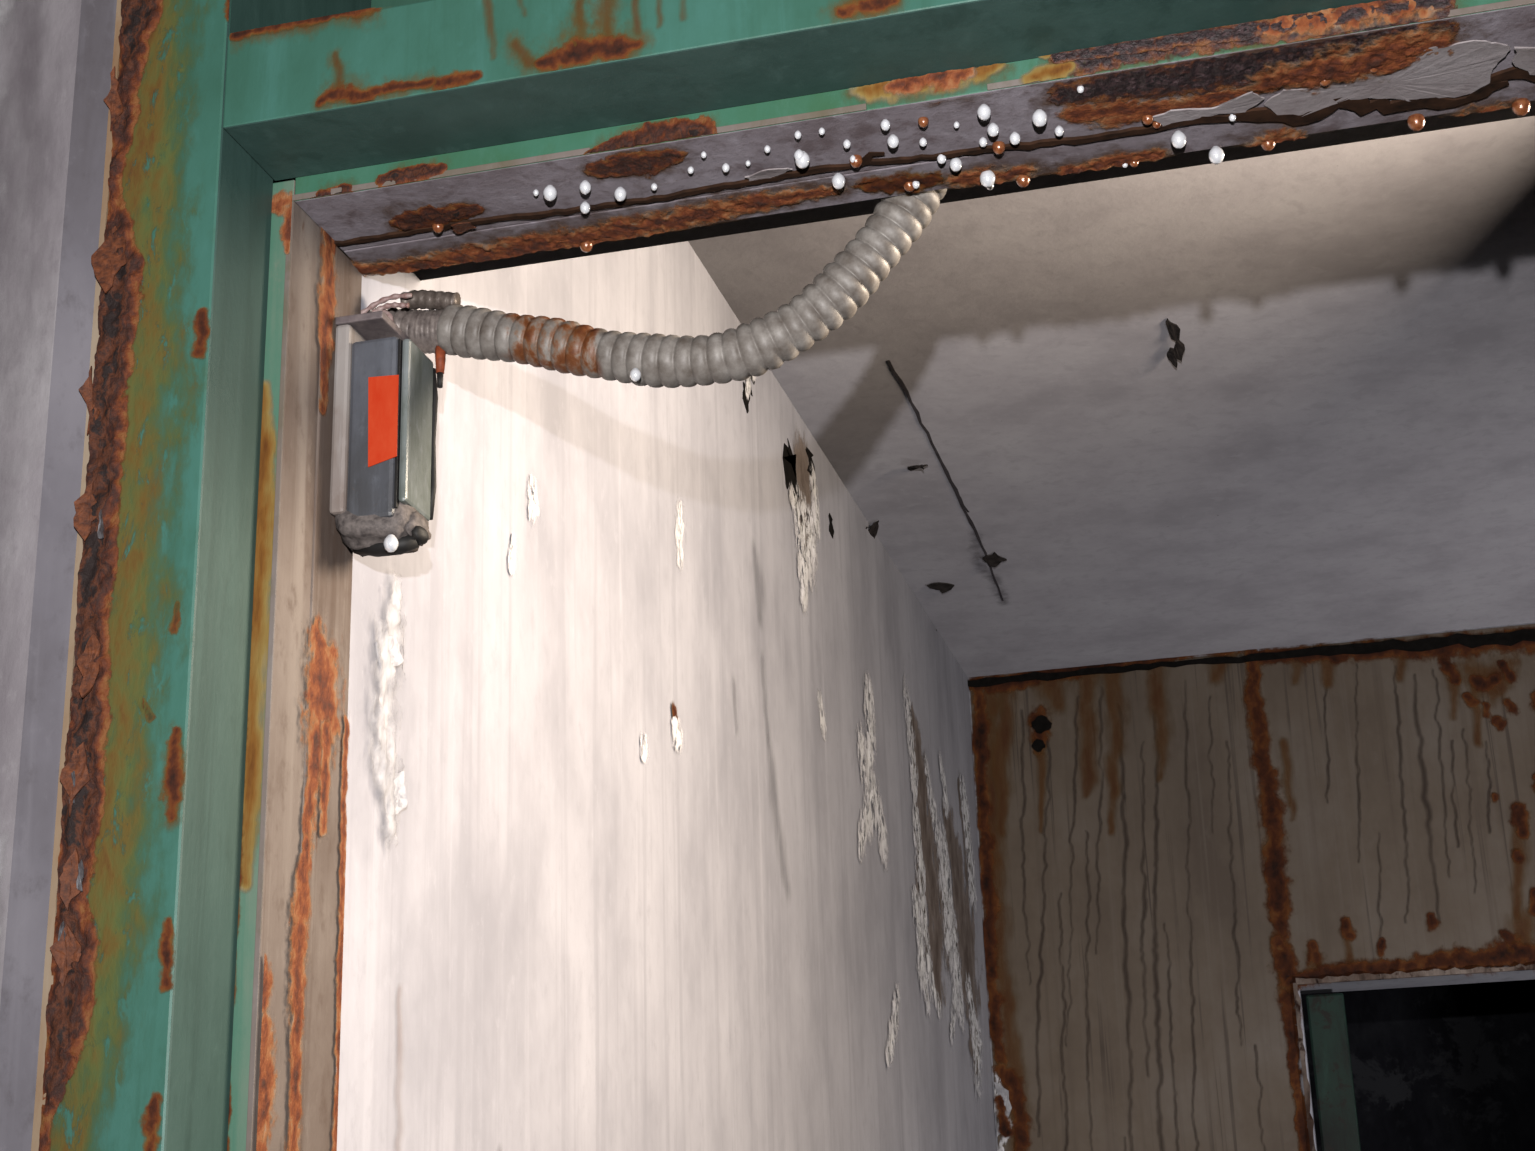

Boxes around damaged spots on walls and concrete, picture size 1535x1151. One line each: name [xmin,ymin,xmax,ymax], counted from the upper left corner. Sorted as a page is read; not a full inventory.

rust [312,144,1170,415]
peeling [745,168,793,181]
rust [1021,0,1460,130]
peeling [1153,40,1535,126]
rust [38,0,210,1151]
rust [237,380,276,935]
rust [256,616,350,1151]
peeling [372,577,408,840]
peeling [857,673,888,868]
crack [887,360,1004,601]
peeling [903,675,1014,1151]
rust [969,627,1535,1151]